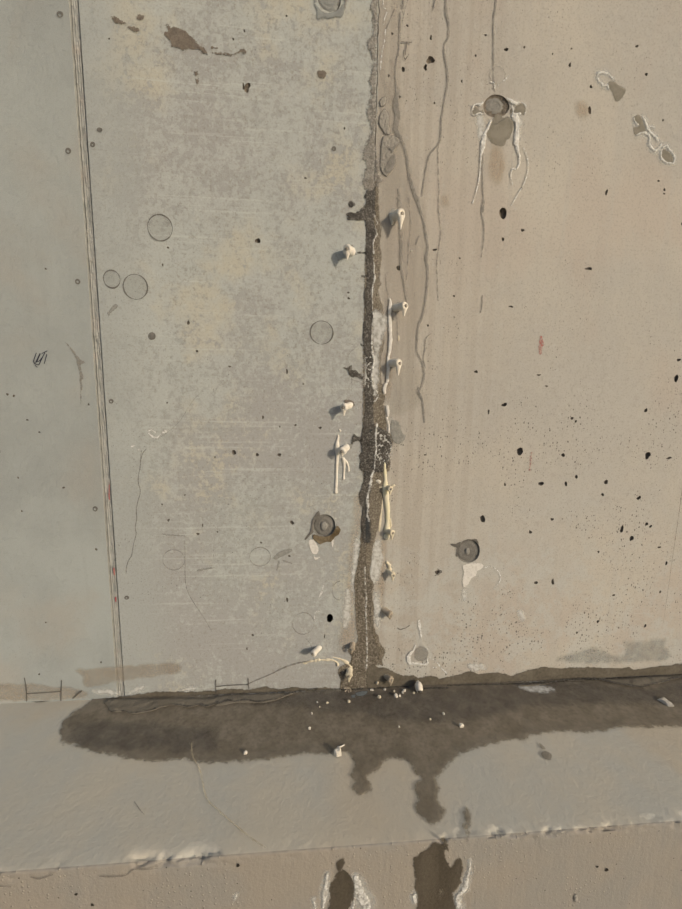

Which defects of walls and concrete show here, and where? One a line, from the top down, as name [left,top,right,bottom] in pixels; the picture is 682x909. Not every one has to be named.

damp [60,181,682,824]
damp [313,859,371,909]
damp [412,837,471,909]